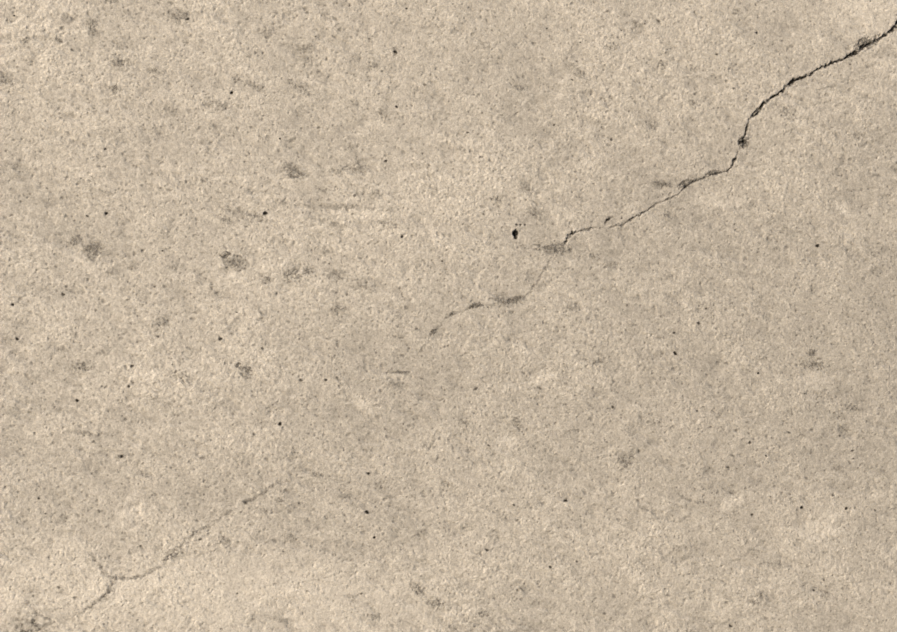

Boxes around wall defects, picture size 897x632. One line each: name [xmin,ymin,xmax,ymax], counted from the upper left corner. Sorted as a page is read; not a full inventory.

crack [655,21,897,188]
crack [430,230,582,334]